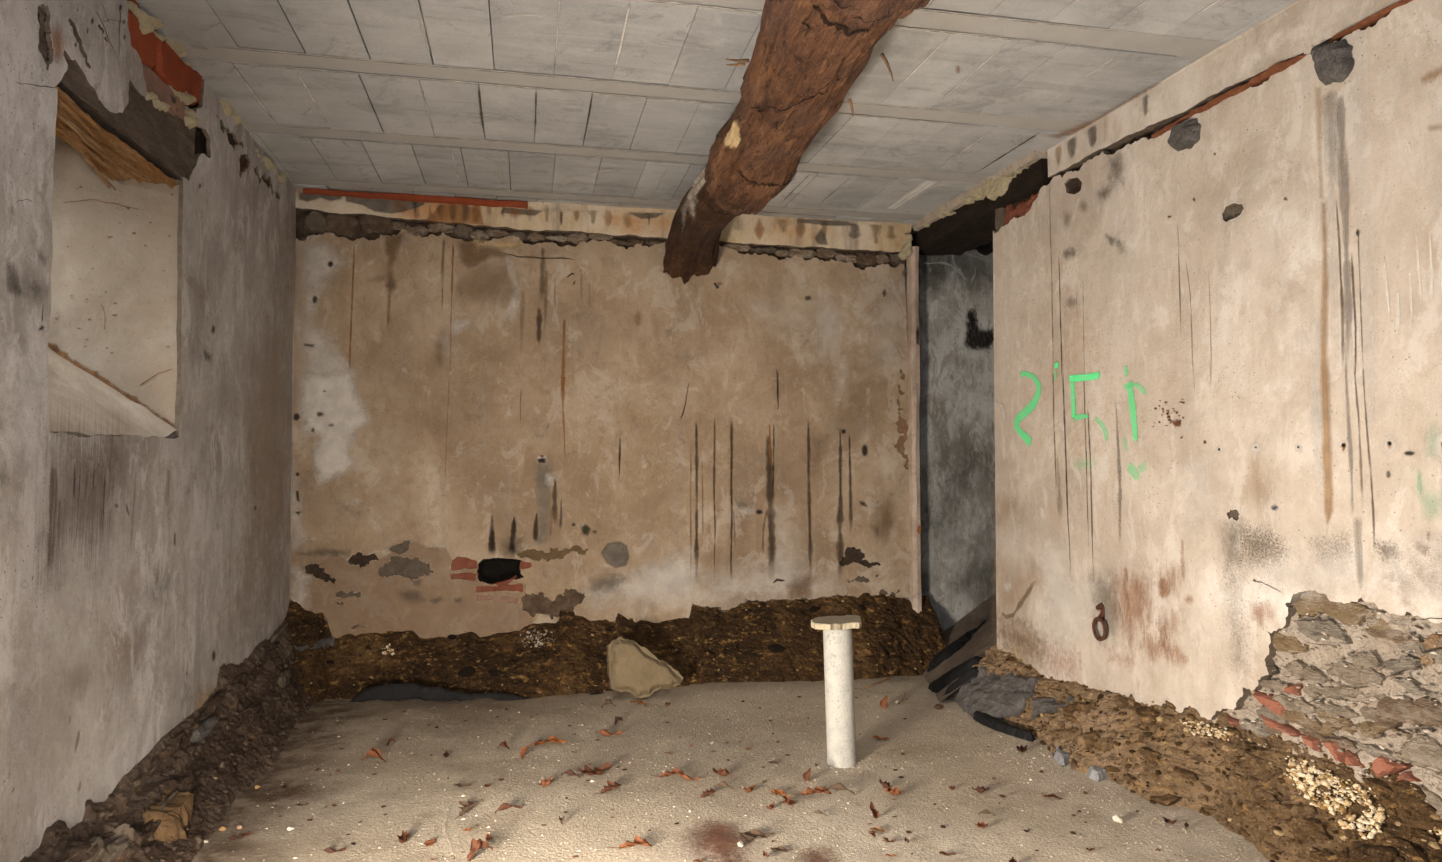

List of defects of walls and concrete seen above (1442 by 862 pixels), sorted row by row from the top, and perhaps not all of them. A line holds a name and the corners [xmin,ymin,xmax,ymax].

leakage [1321,153,1370,519]
spalling [305,564,361,605]
spalling [349,540,588,619]
leakage [694,423,733,570]
leakage [766,425,776,560]
leakage [837,433,852,567]
leakage [1371,481,1397,558]
spalling [1212,591,1442,819]